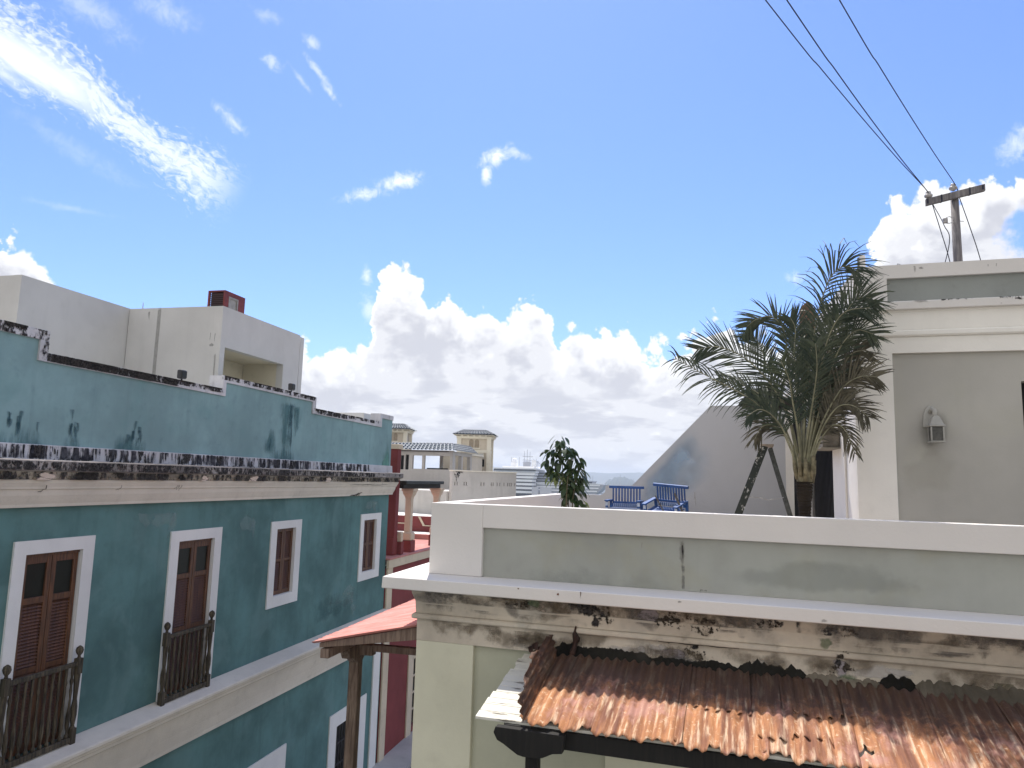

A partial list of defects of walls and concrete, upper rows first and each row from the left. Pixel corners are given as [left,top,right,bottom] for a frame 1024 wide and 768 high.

flaking render [856,667,911,678]